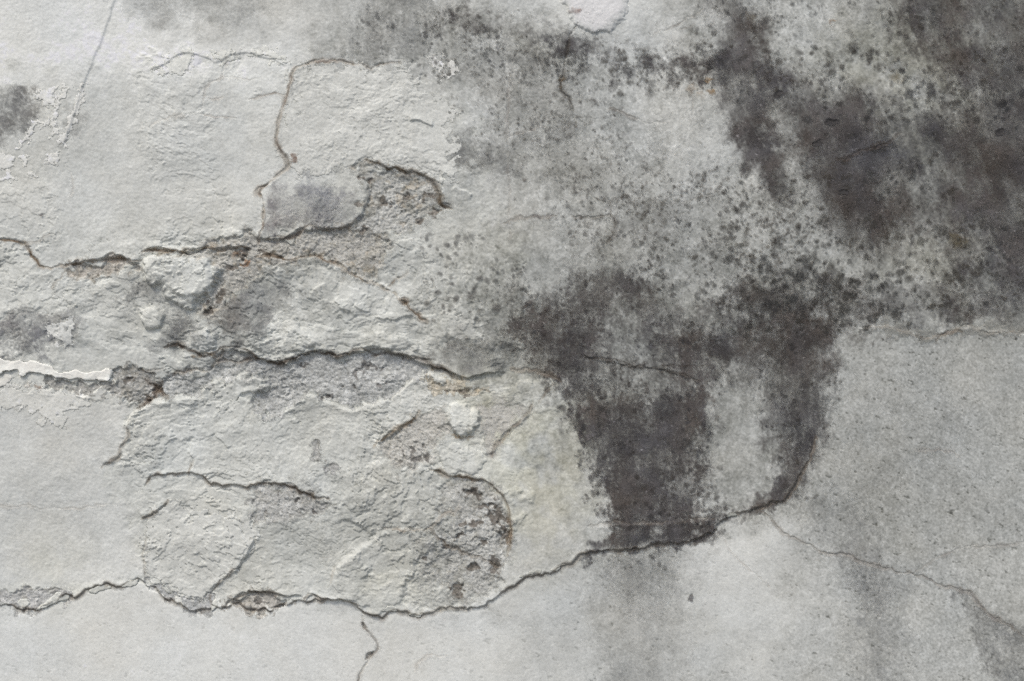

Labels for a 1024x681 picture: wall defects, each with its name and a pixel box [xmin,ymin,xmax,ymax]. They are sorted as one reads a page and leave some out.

peeling [151,45,461,324]
crack [369,161,447,208]
crack [0,239,44,267]
water stain [502,0,1024,568]
crack [245,357,295,365]
crack [429,363,451,374]
spalling [0,344,526,475]
crack [7,579,138,611]
peeling [137,477,330,619]
spalling [415,474,514,607]
crack [504,564,565,592]
crack [350,602,423,681]